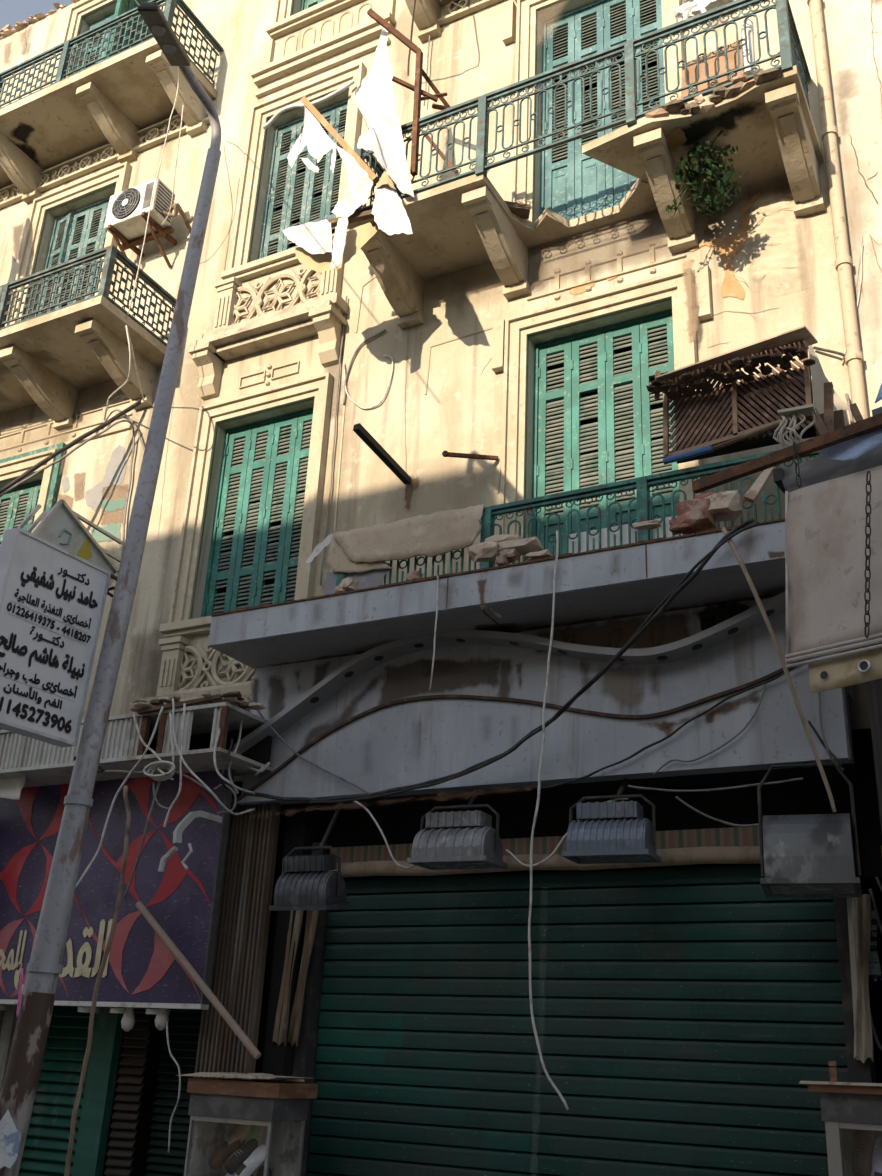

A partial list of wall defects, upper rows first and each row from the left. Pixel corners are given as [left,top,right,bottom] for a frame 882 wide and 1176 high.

crack [871,3,882,112]
spalling [645,69,783,118]
leakage [681,104,759,145]
crack [850,136,879,206]
peeling [683,191,761,342]
crack [855,234,882,299]
peeling [57,445,128,542]